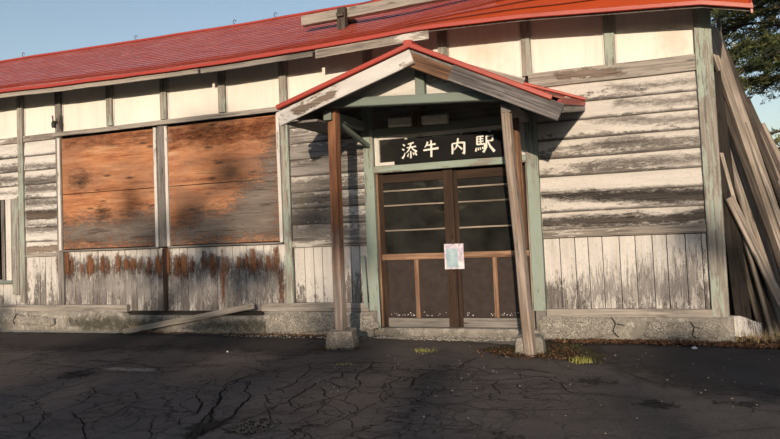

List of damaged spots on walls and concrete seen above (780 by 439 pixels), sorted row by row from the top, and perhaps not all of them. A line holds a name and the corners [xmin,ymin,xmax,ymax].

peeling [289,90,337,116]
peeling [554,66,699,124]
damp [169,116,280,245]
peeling [541,187,705,227]
peeling [575,136,701,171]
damp [63,207,285,284]
rust [55,246,284,306]
crack [70,348,625,439]